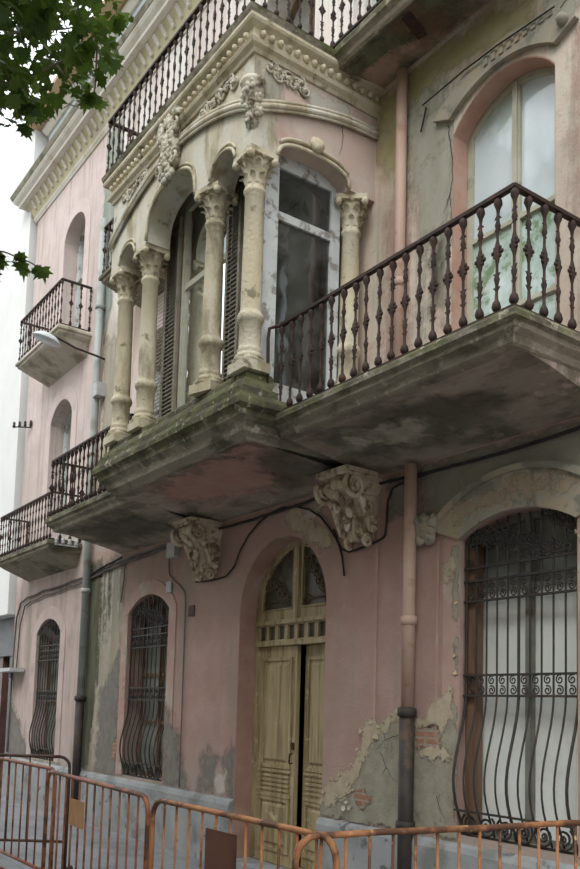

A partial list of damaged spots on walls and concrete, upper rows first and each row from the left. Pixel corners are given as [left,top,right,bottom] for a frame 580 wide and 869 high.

damp [347,0,445,82]
crack [444,126,453,213]
damp [341,418,433,451]
peeling [284,502,332,551]
damp [81,555,124,775]
spalling [320,707,399,828]
spalling [413,685,458,840]